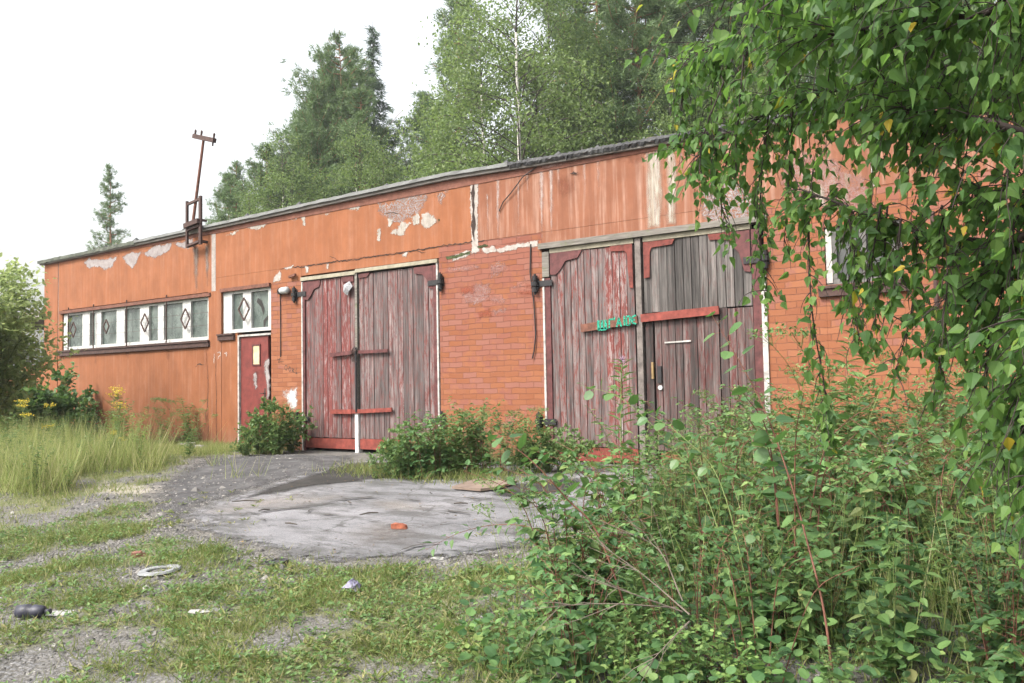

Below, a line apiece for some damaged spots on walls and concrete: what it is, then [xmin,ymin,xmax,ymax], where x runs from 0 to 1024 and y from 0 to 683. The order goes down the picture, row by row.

peeling [84,238,193,270]
crack [280,185,485,270]
peeling [377,193,445,241]
peeling [446,184,538,314]
damp [648,153,676,226]